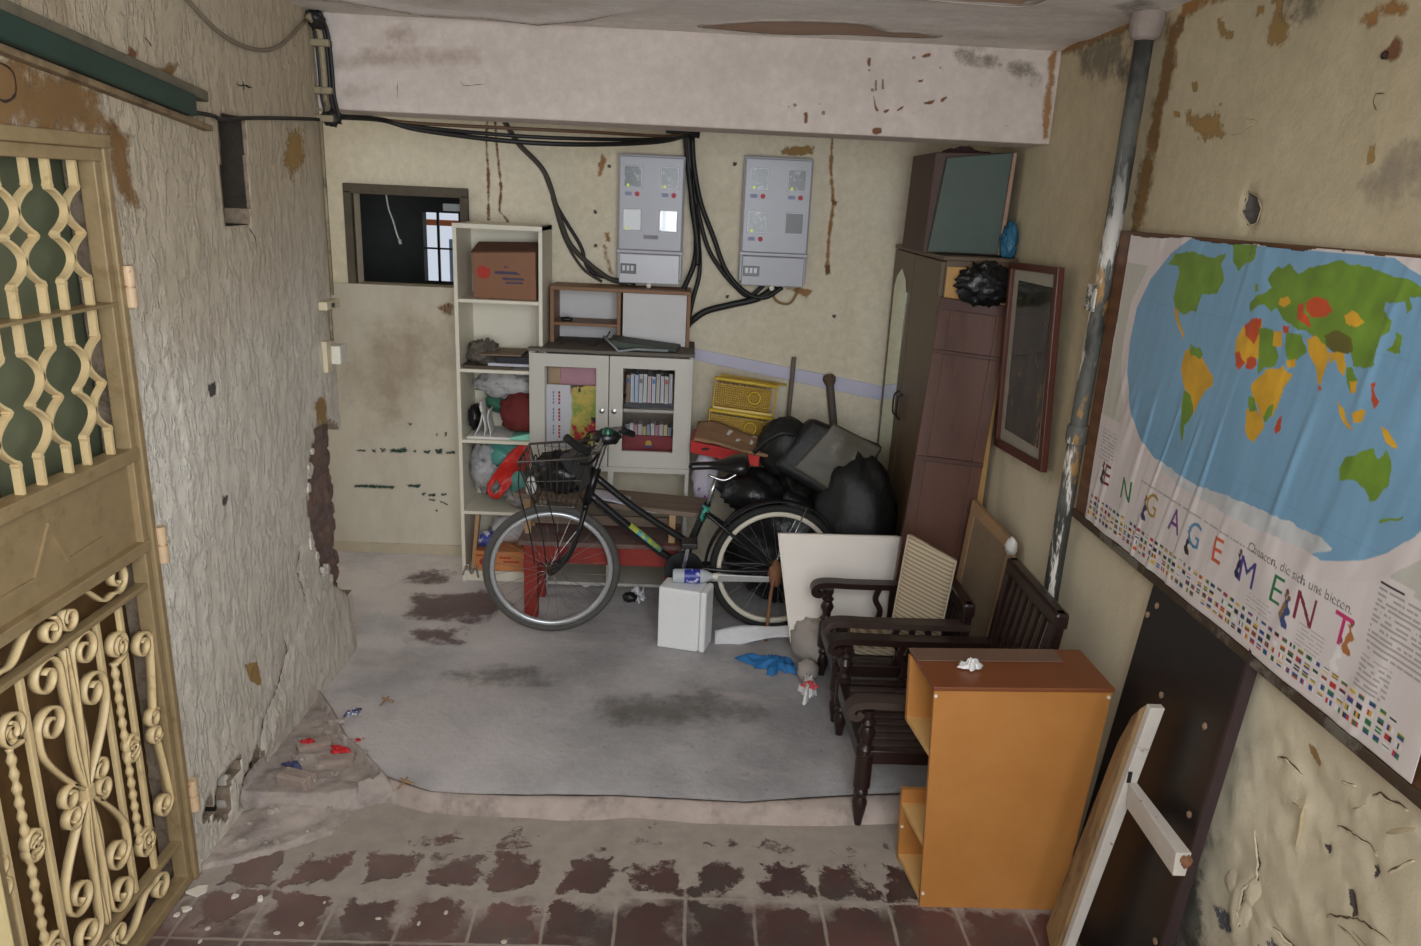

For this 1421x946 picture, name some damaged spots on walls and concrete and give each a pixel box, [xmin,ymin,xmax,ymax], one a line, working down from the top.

leakage [1256,0,1313,46]
leakage [1361,0,1407,28]
corrosion [1043,51,1057,138]
peeling [1174,103,1257,141]
corrosion [825,138,837,275]
spalling [1240,190,1262,226]
spalling [306,396,339,586]
leakage [405,571,499,644]
crack [1341,780,1408,812]
crack [1337,825,1415,874]
crack [1236,830,1295,946]
crack [1326,913,1393,946]